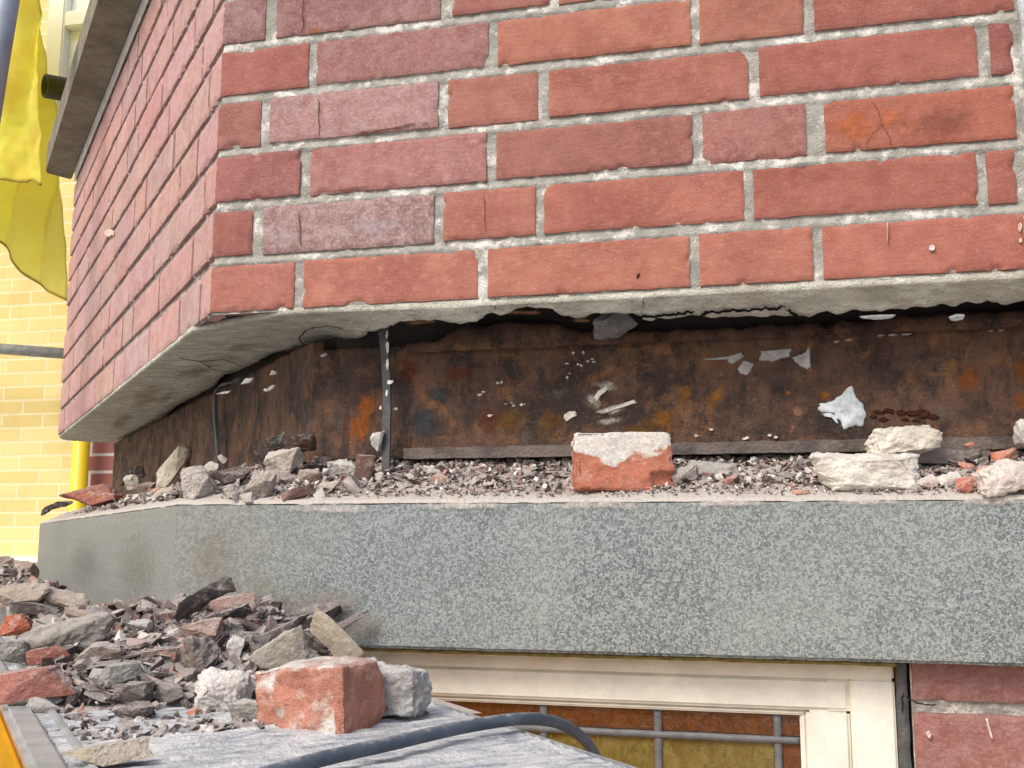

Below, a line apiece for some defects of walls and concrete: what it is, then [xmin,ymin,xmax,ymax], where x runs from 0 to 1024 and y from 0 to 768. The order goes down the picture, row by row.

crack [282,326,342,355]
crack [180,358,242,372]
peeling [704,347,811,375]
peeling [818,386,939,429]
rust [210,431,286,485]
rust [918,448,991,466]